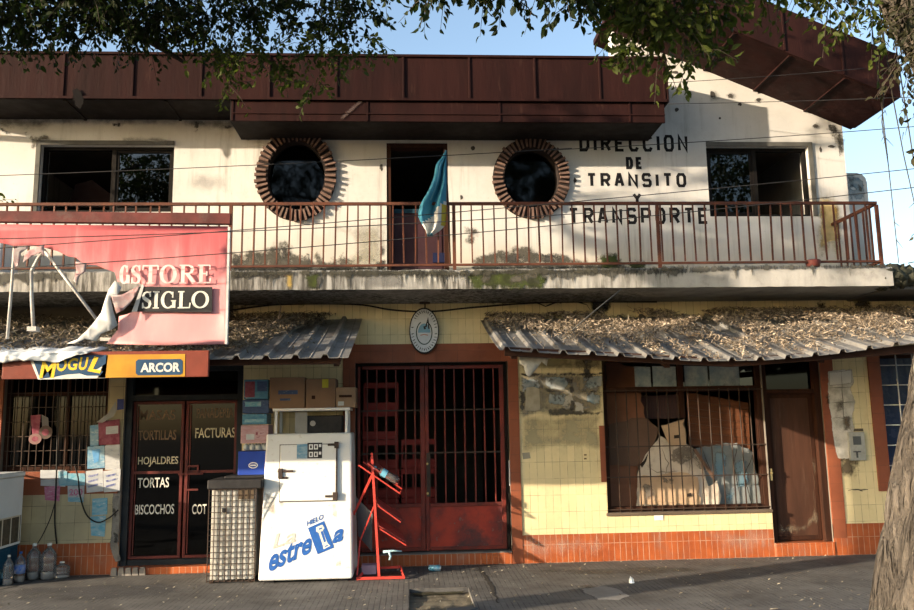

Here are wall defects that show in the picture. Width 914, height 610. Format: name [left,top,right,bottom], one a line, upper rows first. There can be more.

corrosion [820,200,838,247]
water stain [231,232,886,287]
peeling [519,373,602,415]
peeling [827,369,855,459]